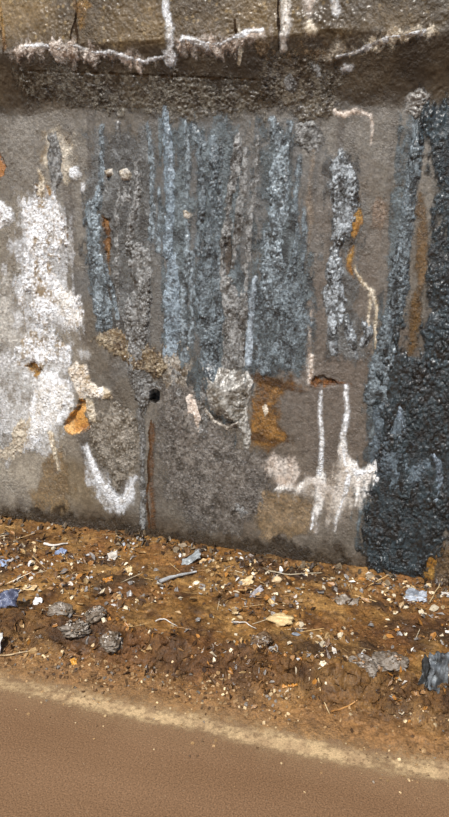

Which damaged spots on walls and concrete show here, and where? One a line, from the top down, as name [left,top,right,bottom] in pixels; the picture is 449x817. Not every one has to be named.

water stain [0,0,449,583]
spalling [64,397,97,435]
corrosion [250,373,303,451]
spalling [311,377,343,387]
crack [136,409,155,533]